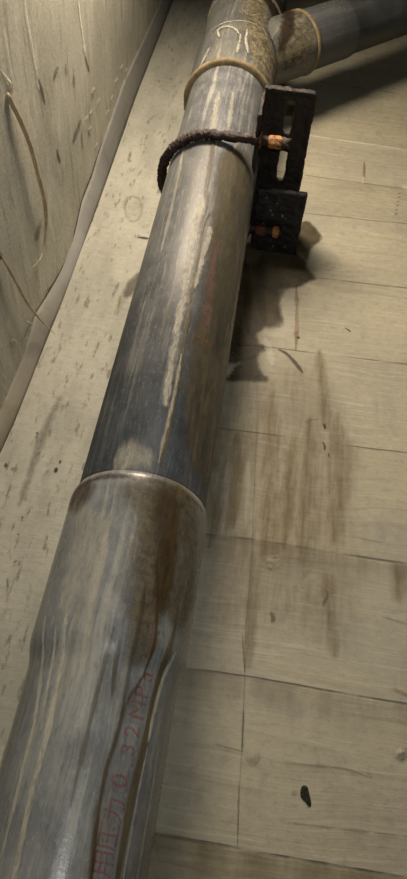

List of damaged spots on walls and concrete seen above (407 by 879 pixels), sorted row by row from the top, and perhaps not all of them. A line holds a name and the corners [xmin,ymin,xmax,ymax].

water stain [160,140,321,482]